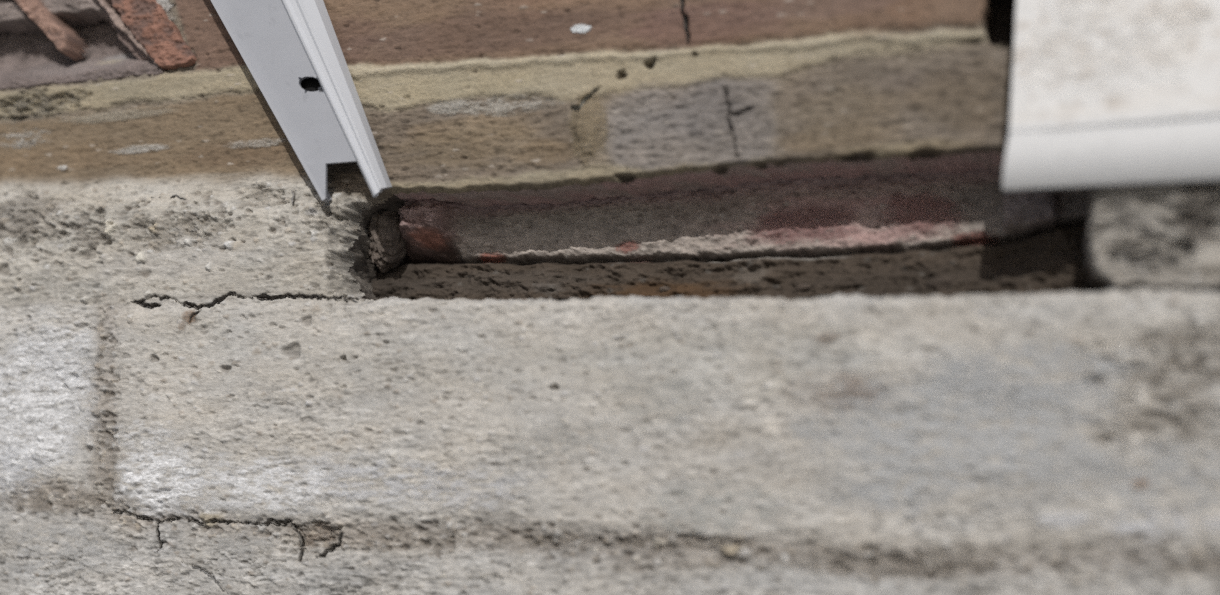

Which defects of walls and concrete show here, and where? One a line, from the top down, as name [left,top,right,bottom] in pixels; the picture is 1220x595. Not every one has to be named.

crack [680,0,689,44]
crack [570,87,599,111]
crack [724,90,752,156]
spalling [314,152,1110,301]
crack [133,292,357,323]
crack [1097,283,1220,291]
crack [113,510,342,593]